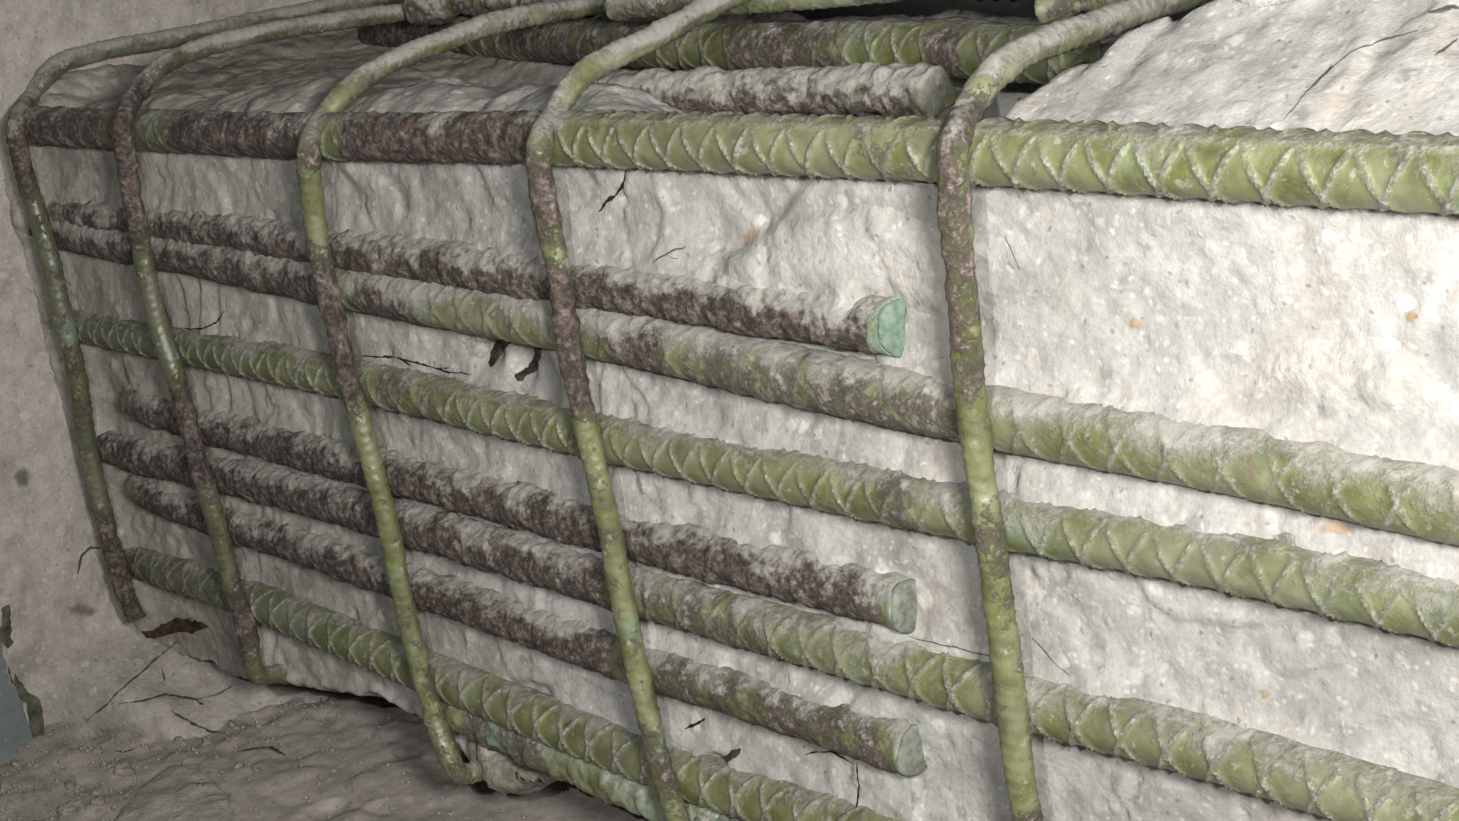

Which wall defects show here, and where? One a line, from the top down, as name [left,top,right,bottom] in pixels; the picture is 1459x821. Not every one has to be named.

crack [1284,5,1459,119]
spalling [463,338,511,367]
spalling [515,347,542,381]
spalling [1274,533,1295,547]
peeling [0,604,14,648]
peeling [14,674,44,739]
spalling [724,748,741,763]